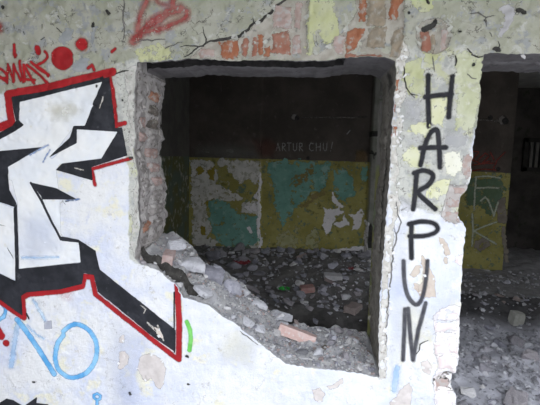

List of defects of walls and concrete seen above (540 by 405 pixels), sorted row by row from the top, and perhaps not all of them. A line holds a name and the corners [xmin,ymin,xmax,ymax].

crack [120,0,286,57]
flaking render [124,42,173,256]
flaking render [189,0,453,379]
peeling [426,151,509,266]
peeling [136,353,166,389]
flaking render [421,305,461,405]